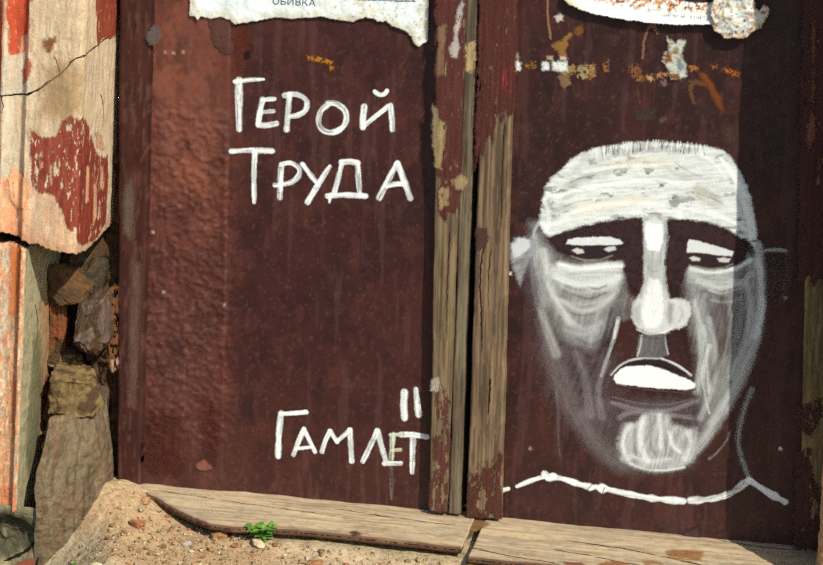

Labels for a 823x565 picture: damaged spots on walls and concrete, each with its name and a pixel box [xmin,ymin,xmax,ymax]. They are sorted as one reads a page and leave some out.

peeling [0,0,33,91]
crack [0,35,110,114]
peeling [96,0,120,44]
peeling [7,115,109,246]
flaking render [0,483,16,512]